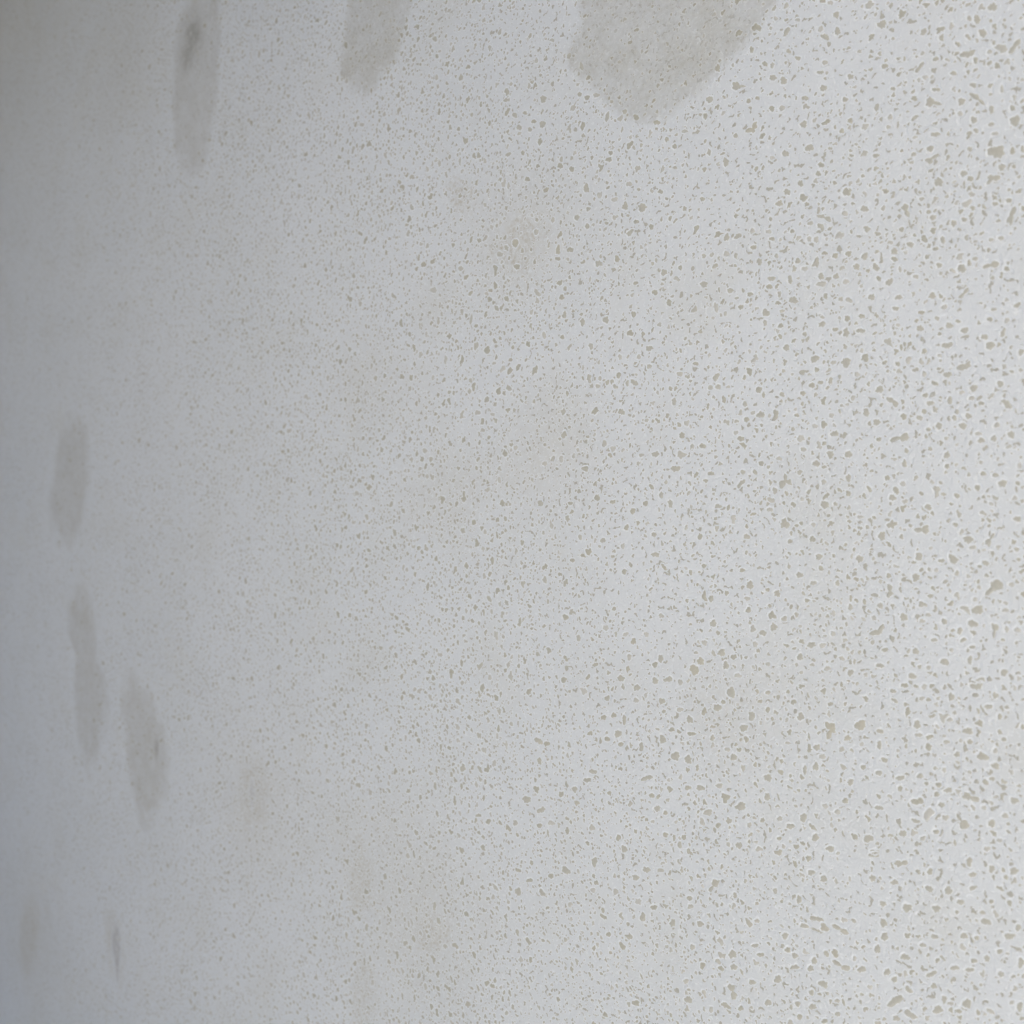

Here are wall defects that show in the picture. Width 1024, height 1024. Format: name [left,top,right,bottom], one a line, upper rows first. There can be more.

water stain [337,0,414,104]
water stain [565,0,783,127]